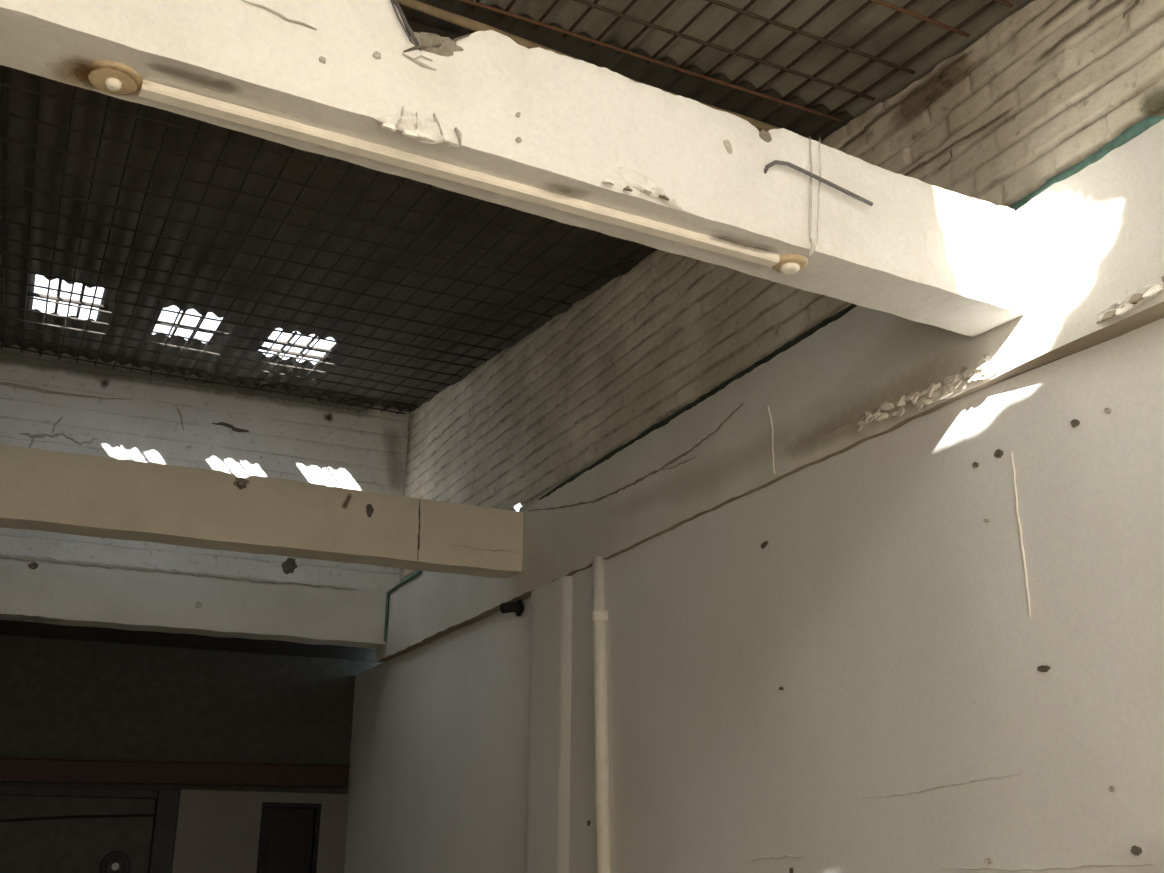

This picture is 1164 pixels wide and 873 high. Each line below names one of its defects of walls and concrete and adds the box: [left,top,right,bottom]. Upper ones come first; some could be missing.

crack [241,0,317,30]
spalling [390,0,470,71]
peeling [374,105,462,147]
peeling [601,167,686,210]
spalling [1095,276,1164,323]
crack [0,382,132,448]
peeling [857,355,1011,432]
crack [0,554,360,590]
crack [864,774,1021,799]